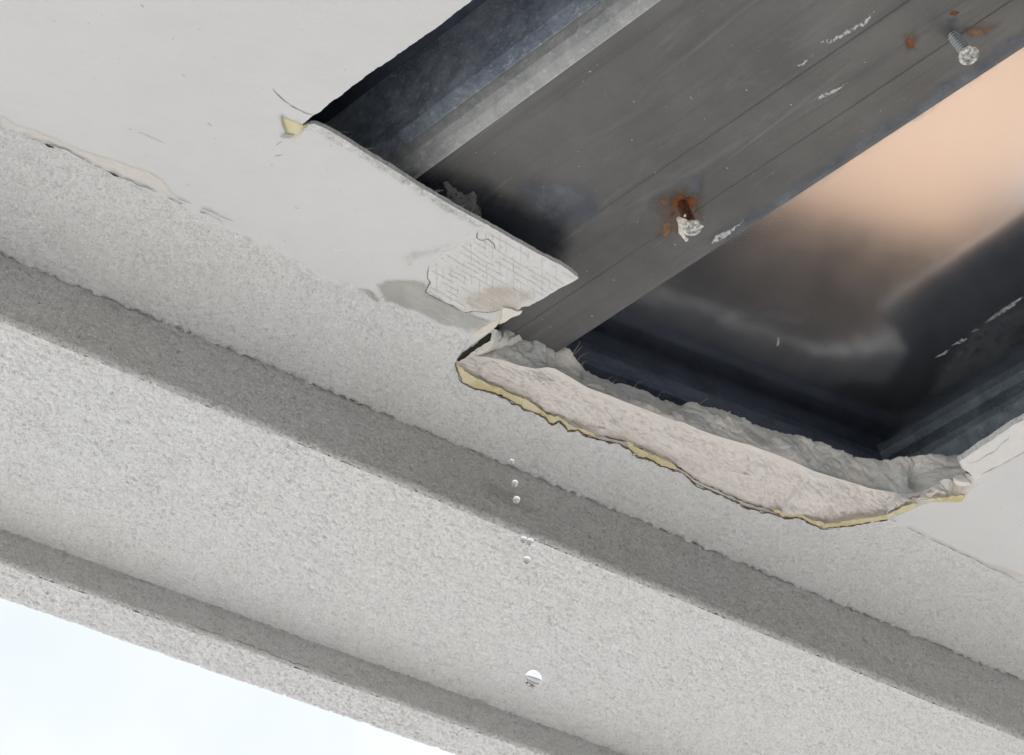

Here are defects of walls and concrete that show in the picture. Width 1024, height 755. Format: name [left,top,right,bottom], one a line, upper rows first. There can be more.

spalling [425,231,1024,530]